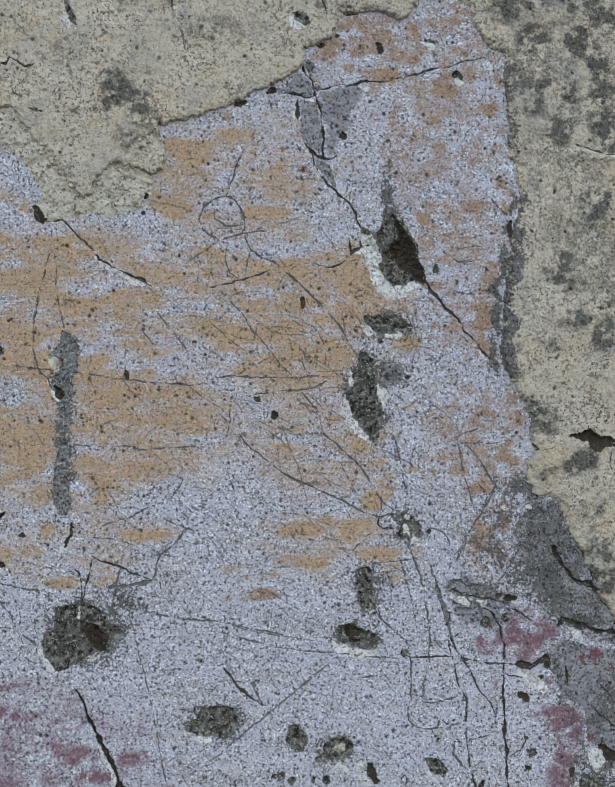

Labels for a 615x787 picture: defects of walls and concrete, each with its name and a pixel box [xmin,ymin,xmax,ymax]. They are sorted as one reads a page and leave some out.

peeling [300,82,367,187]
crack [284,57,485,268]
crack [14,219,152,389]
spalling [337,214,429,463]
crack [425,281,490,361]
spalling [25,576,149,681]
crack [74,688,126,787]
crack [75,557,152,598]
spalling [168,667,264,748]
spalling [285,724,380,787]
crack [132,564,551,787]
spalling [323,553,395,659]